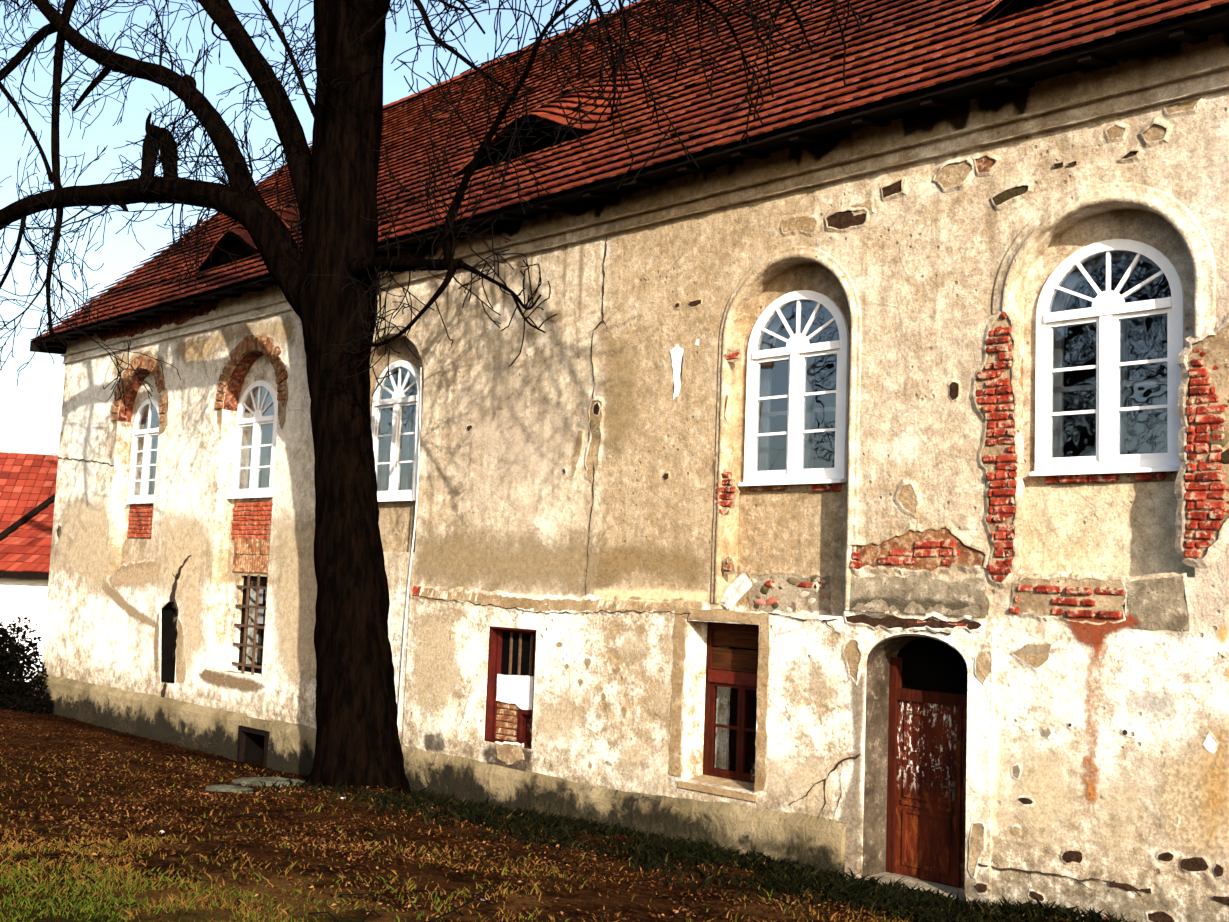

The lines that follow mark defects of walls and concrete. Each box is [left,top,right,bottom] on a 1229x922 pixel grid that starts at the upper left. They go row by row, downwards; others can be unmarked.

spalling [1103,94,1209,164]
spalling [779,176,908,238]
spalling [931,151,1003,193]
spalling [989,181,1034,212]
crack [591,237,608,399]
spalling [1174,312,1229,569]
flaking render [713,469,740,516]
flaking render [722,306,1127,686]
crack [169,555,192,602]
rust [1067,612,1138,804]
crack [789,754,860,819]